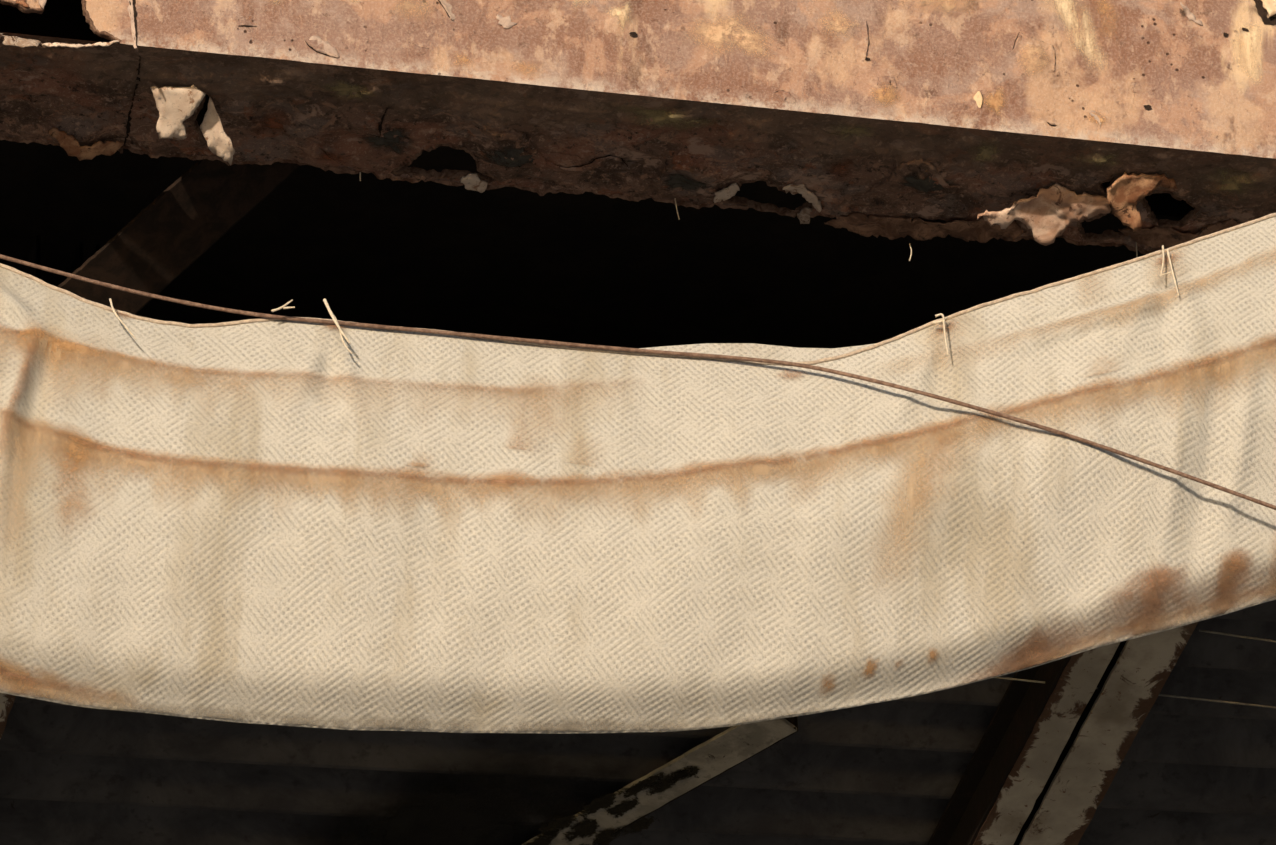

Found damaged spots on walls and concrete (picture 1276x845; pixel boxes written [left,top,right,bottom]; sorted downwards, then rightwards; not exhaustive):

peeling [0,33,119,48]
rust [611,5,628,27]
rust [694,18,763,52]
rust [1054,0,1100,57]
rust [1236,27,1261,79]
peeling [1254,0,1276,25]
crack [106,0,141,153]
peeling [48,127,124,161]
peeling [150,84,235,165]
peeling [461,173,488,193]
peeling [783,172,1240,249]
rust [16,328,136,371]